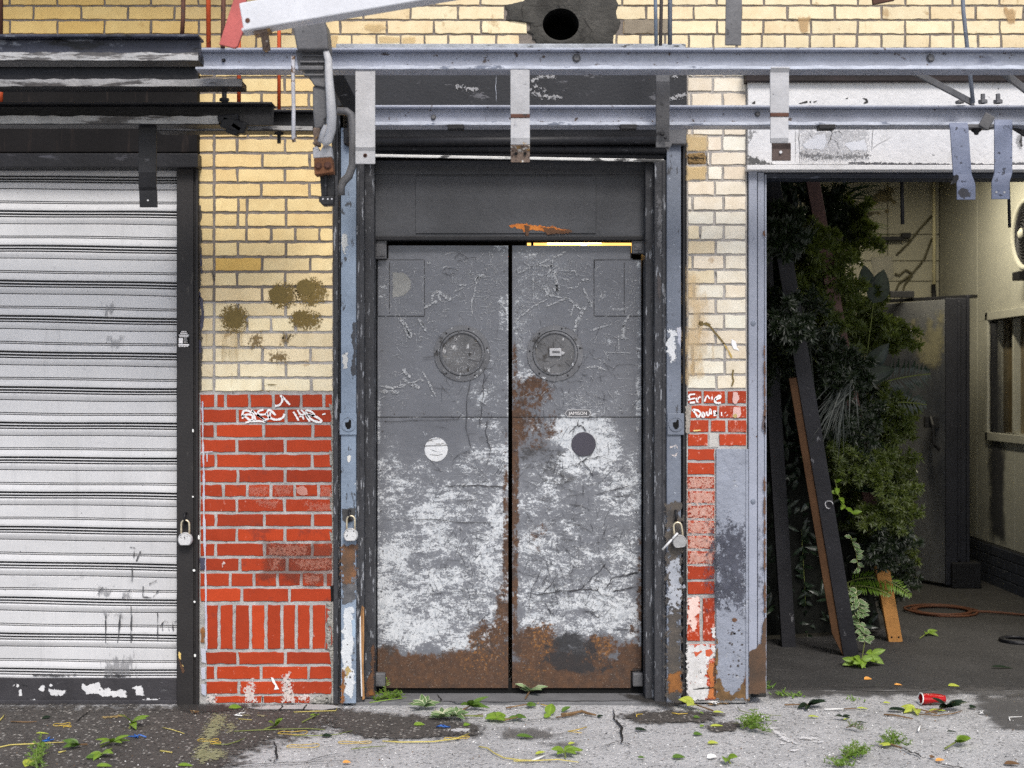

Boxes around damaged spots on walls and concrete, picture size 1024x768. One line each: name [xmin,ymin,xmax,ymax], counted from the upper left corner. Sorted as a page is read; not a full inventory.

rust [509,223,572,236]
water stain [248,330,296,365]
peeling [271,578,362,705]
peeling [687,595,701,631]
peeling [686,618,744,701]
rust [707,477,767,705]